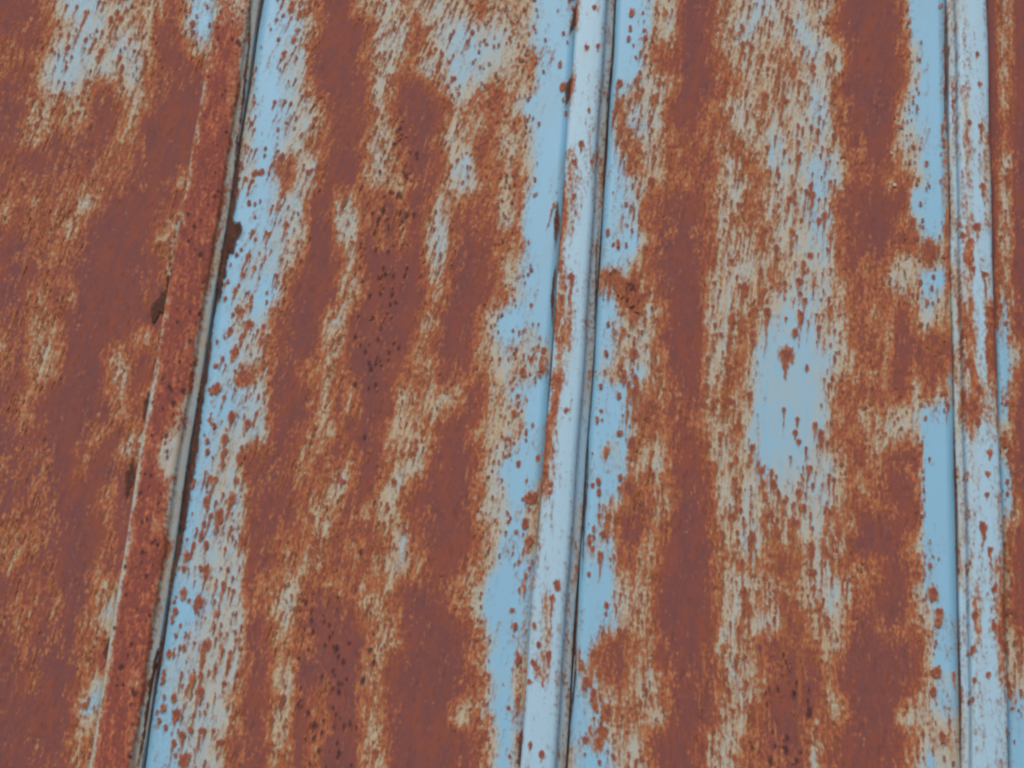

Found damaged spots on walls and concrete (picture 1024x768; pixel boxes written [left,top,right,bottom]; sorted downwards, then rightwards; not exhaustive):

rust [0,0,582,768]
peeling [402,0,531,290]
rust [556,0,1024,768]